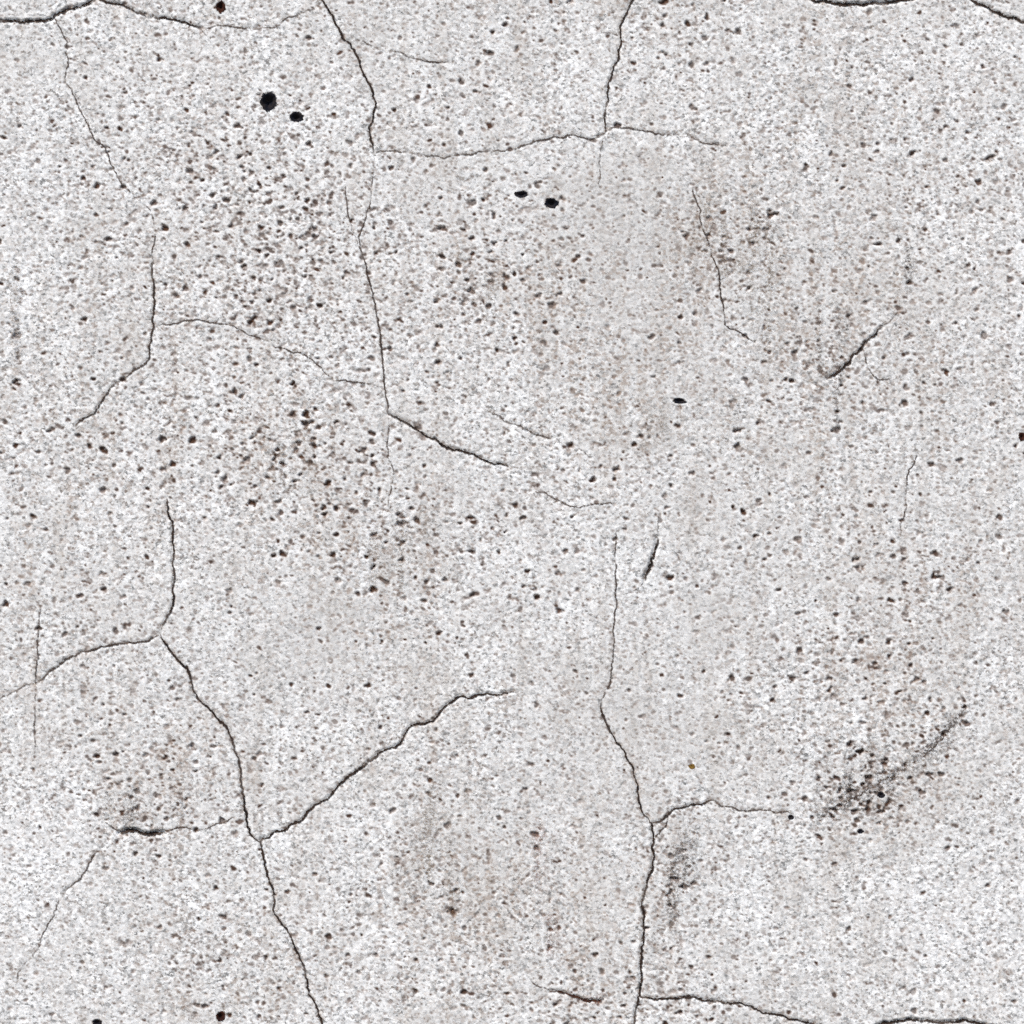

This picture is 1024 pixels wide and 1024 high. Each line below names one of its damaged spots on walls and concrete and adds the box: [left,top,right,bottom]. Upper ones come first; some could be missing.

crack [812,0,907,8]
crack [971,0,1024,23]
crack [0,0,726,502]
crack [692,189,755,342]
crack [826,313,897,381]
crack [535,491,612,508]
crack [900,455,917,531]
crack [1,498,514,1024]
crack [600,517,814,1024]
crack [533,983,604,1003]
crack [878,1016,985,1024]